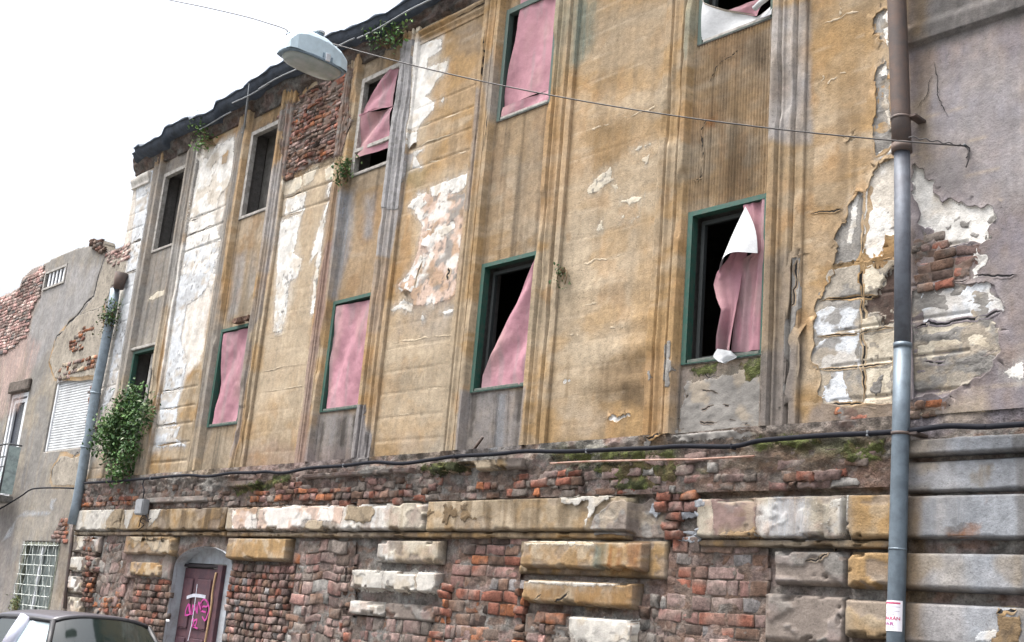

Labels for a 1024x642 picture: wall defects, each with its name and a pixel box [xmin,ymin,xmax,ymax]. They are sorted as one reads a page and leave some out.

crack [53,256,136,363]
peeling [48,170,153,424]
peeling [150,137,234,448]
flaking render [259,66,354,333]
peeling [381,19,467,321]
peeling [587,167,642,223]
crack [917,61,949,117]
spalling [910,154,1024,419]
spalling [475,469,757,554]
spalling [975,615,1021,642]